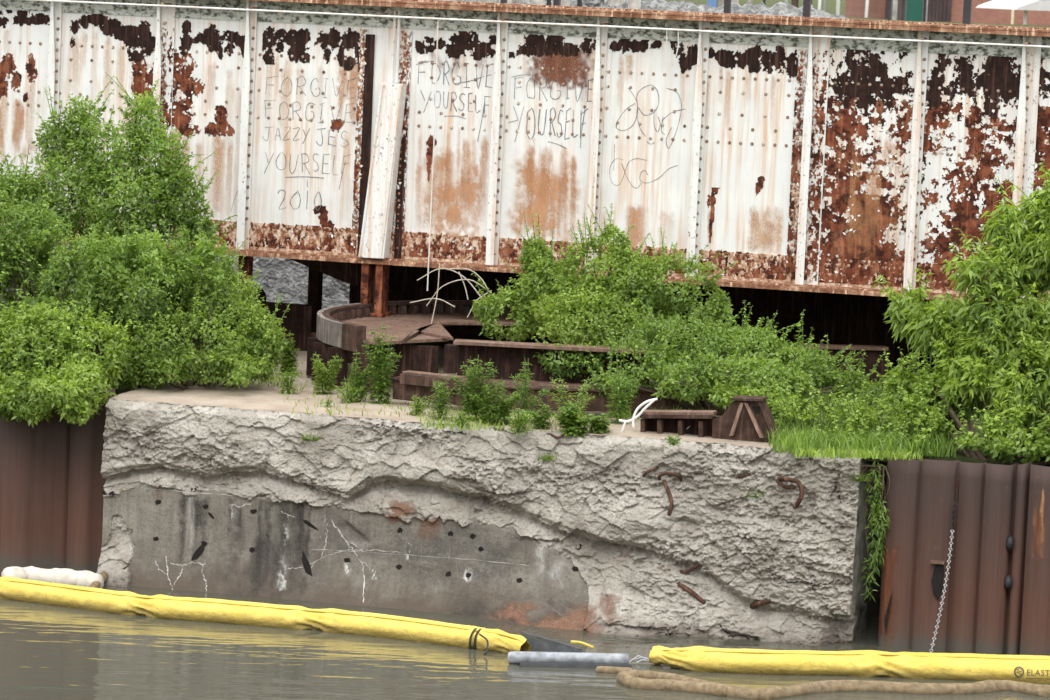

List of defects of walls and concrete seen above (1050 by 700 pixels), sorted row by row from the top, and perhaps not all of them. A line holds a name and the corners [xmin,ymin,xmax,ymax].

corrosion [0,53,38,147]
peeling [69,14,156,63]
corrosion [130,28,235,192]
peeling [262,26,360,71]
peeling [609,39,798,78]
corrosion [618,49,1018,291]
peeling [828,49,1021,123]
corrosion [1033,106,1050,198]
crack [155,556,207,592]
crack [113,485,294,521]
crack [288,515,528,602]
spalling [96,398,860,645]